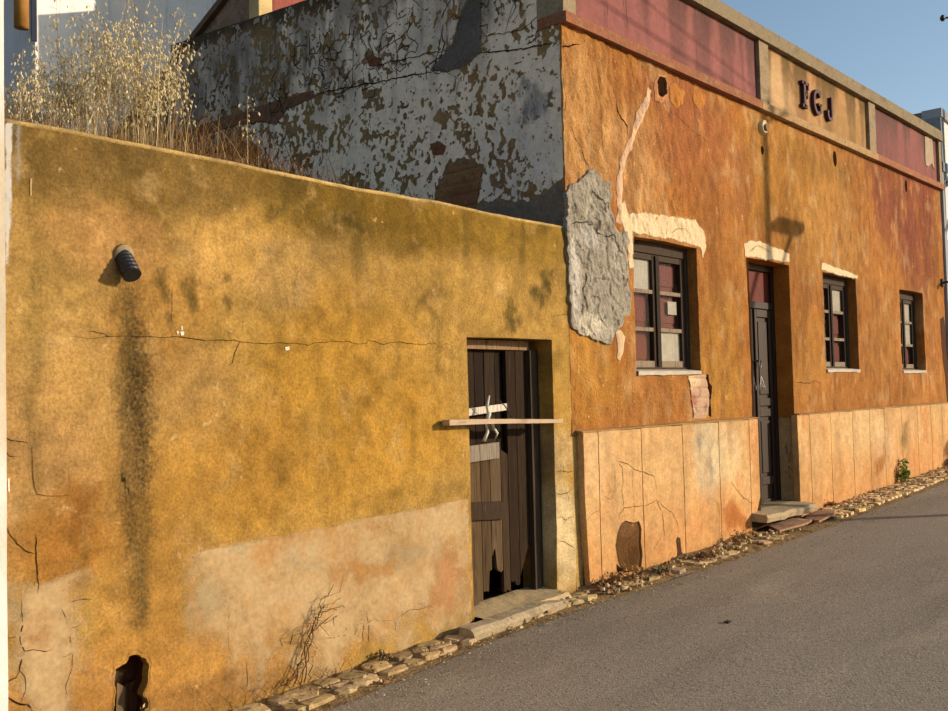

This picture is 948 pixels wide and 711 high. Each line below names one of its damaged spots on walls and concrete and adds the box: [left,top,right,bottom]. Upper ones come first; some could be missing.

crack [173,0,580,139]
spalling [654,74,706,109]
peeling [171,0,632,361]
crack [74,312,464,366]
crack [558,461,678,549]
spalling [615,521,640,575]
crack [7,529,86,711]
spalling [113,650,152,711]